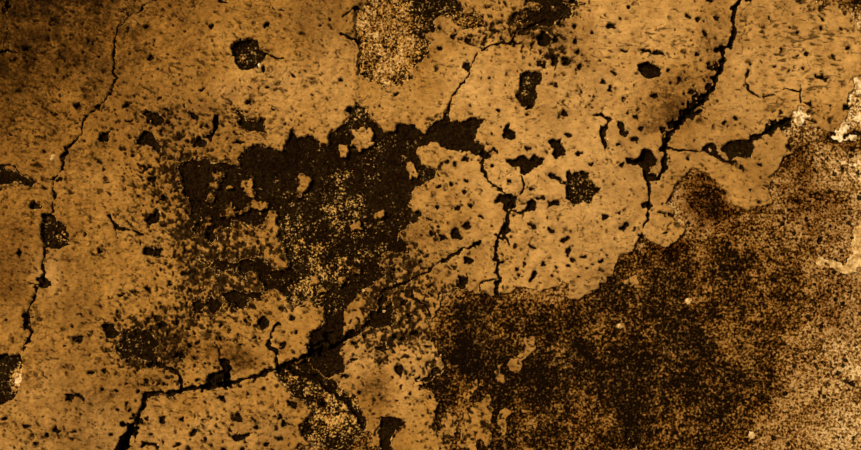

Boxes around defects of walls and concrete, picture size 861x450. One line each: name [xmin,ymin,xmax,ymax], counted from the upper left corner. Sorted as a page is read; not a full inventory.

crack [21,245,51,352]
crack [41,0,157,217]
flaking render [177,100,517,450]
flaking render [353,0,493,96]
crack [374,148,528,317]
flaking render [512,0,582,116]
spalling [494,133,601,230]
spalling [590,112,658,181]
leakage [416,77,861,450]
crack [637,0,820,239]
spalling [702,138,762,171]
crack [114,321,365,450]